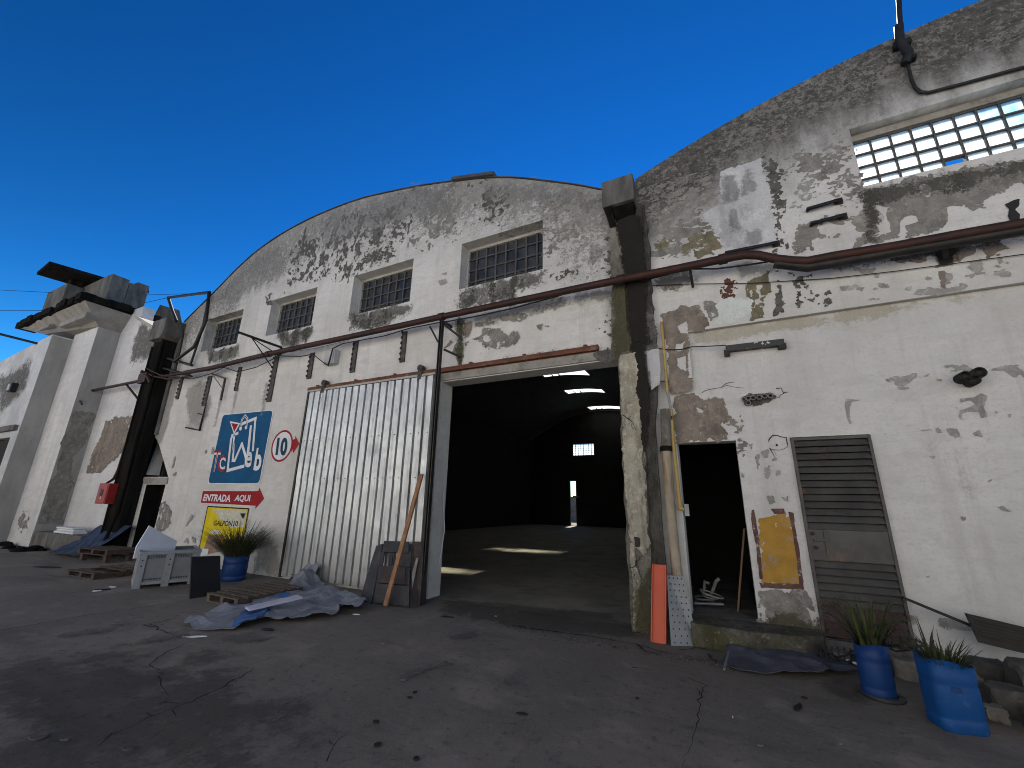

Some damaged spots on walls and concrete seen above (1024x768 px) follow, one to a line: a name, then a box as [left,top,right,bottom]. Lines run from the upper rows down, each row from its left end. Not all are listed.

leakage [457,270,545,309]
peeling [745,267,890,321]
peeling [444,284,576,354]
rust [386,344,598,382]
peeling [645,300,781,479]
peeling [886,364,972,390]
peeling [991,365,1024,377]
peeling [921,393,1012,438]
peeling [18,411,132,533]